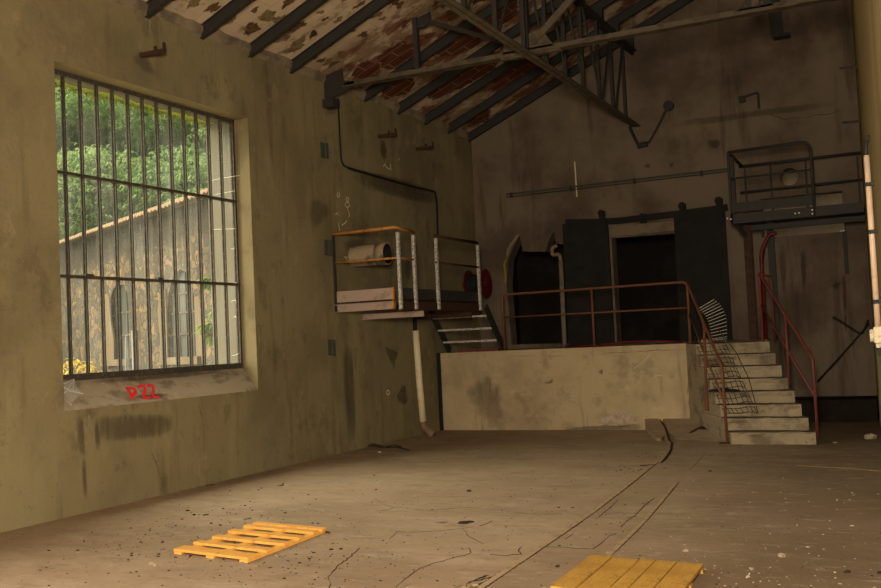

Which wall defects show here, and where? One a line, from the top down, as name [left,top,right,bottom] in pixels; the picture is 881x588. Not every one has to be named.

peeling [188,0,221,12]
peeling [243,0,295,35]
peeling [271,21,318,53]
crack [564,498,654,549]
crack [378,501,522,588]